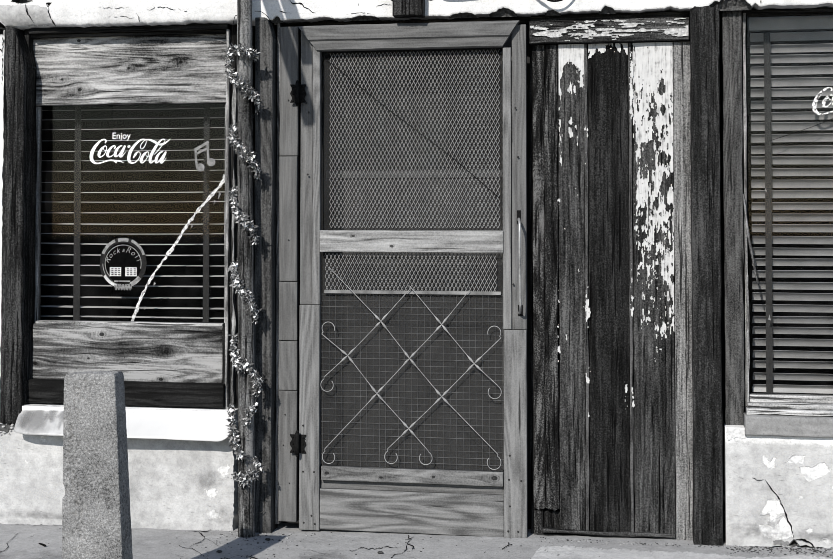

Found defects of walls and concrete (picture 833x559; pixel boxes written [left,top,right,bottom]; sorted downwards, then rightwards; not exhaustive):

peeling [530,6,688,359]
flaking render [785,454,832,482]
crack [175,529,258,559]
crack [312,535,415,559]
flaking render [758,499,800,547]
crack [754,478,832,548]